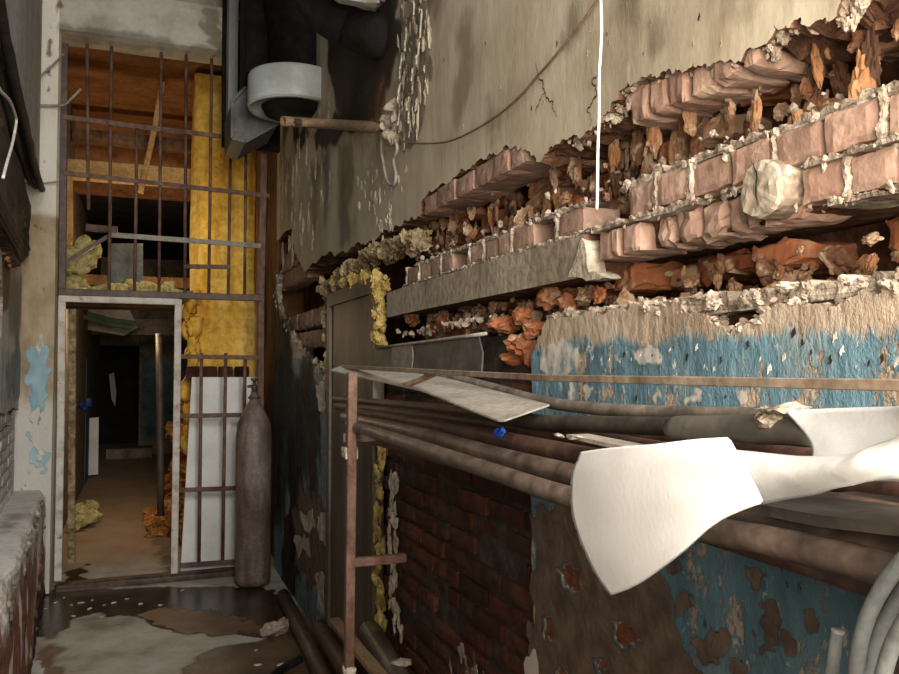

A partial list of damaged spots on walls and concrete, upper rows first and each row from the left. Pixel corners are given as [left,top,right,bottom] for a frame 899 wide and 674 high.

flaking render [356,160,407,247]
spalling [395,0,899,400]
spalling [1,252,12,312]
spalling [273,249,327,414]
peeling [7,334,52,474]
leakage [9,513,312,674]
peeling [281,479,326,617]
peeling [526,503,748,674]
peeling [745,566,797,657]